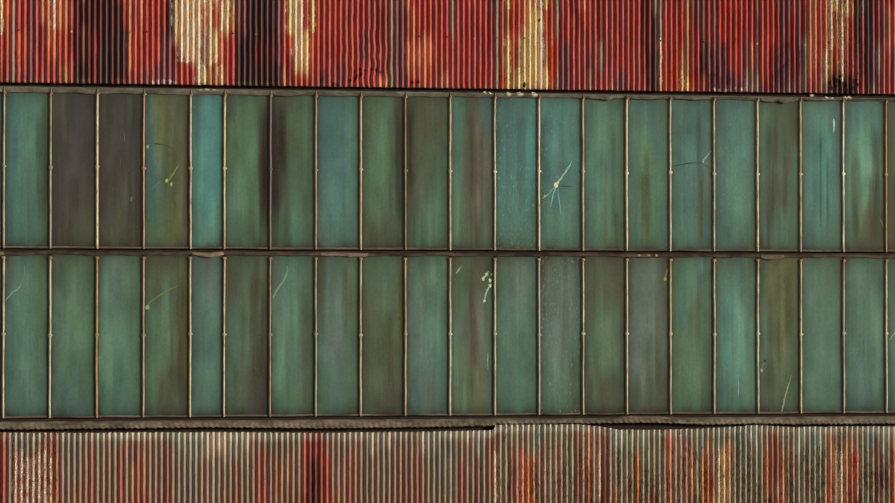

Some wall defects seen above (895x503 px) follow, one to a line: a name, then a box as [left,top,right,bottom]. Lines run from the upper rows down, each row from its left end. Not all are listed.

peeling [171,0,231,83]
peeling [503,0,550,89]
rust [828,72,860,96]
crack [542,161,573,213]
peeling [11,448,56,503]